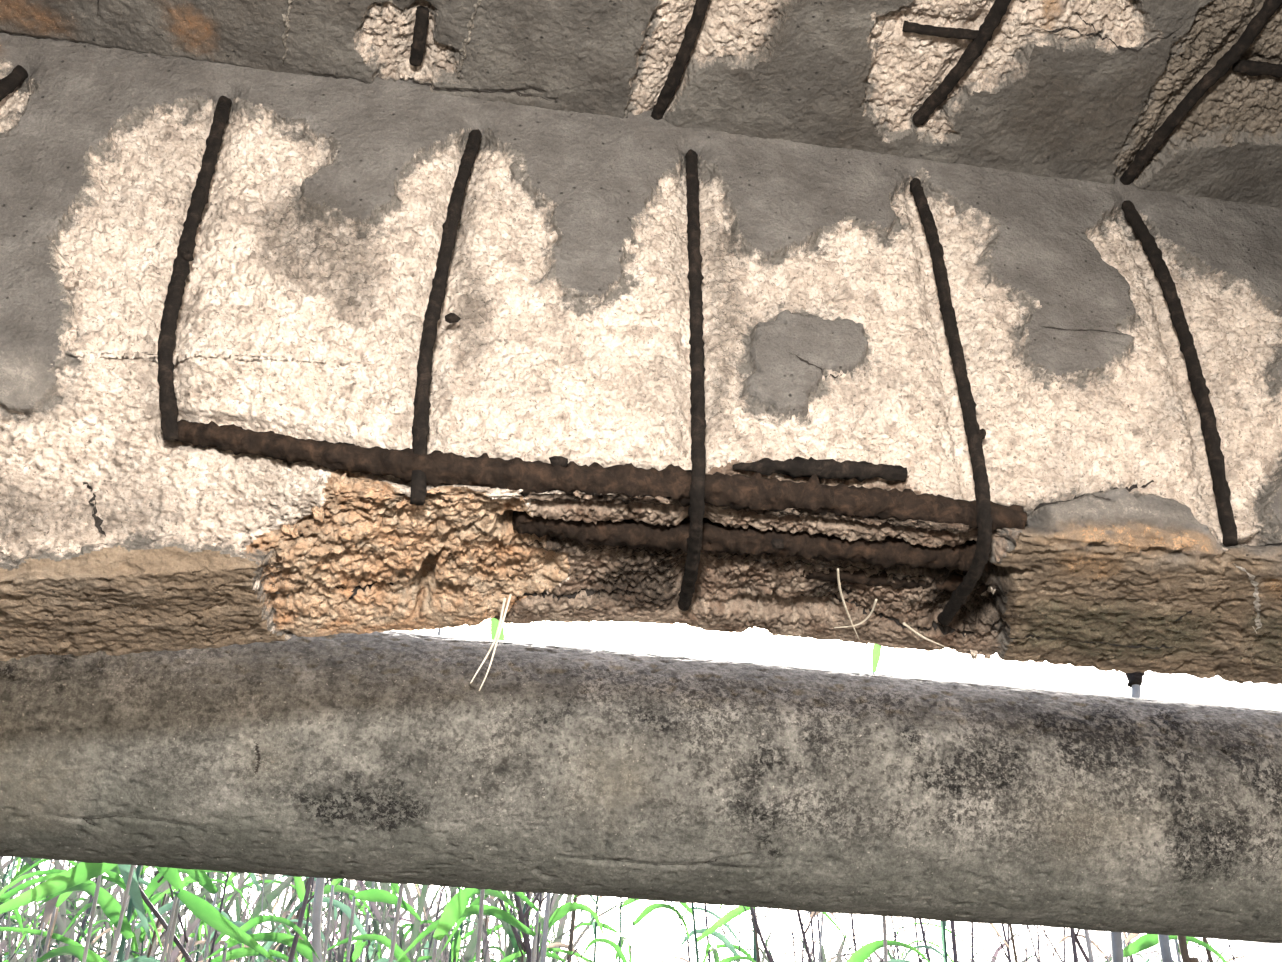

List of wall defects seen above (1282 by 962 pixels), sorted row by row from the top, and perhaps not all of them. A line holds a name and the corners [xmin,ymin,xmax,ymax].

spalling [0,58,41,139]
spalling [352,0,466,92]
spalling [624,0,797,119]
spalling [861,0,1282,187]
crack [1033,12,1182,52]
spalling [0,95,1282,660]
corrosion [1055,524,1211,578]
crack [775,588,1192,649]